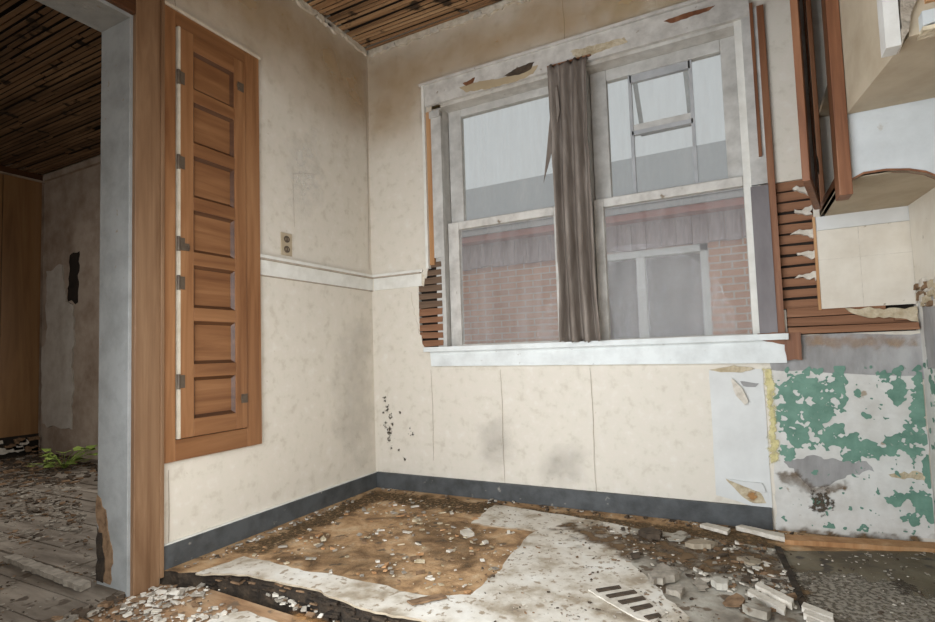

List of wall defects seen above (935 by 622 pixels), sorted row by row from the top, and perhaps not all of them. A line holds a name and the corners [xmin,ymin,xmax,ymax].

peeling [459,62,538,93]
spalling [421,259,439,347]
peeling [0,251,80,460]
peeling [726,191,935,540]
leakage [236,491,501,553]
leakage [519,507,935,622]
leakage [779,472,847,512]